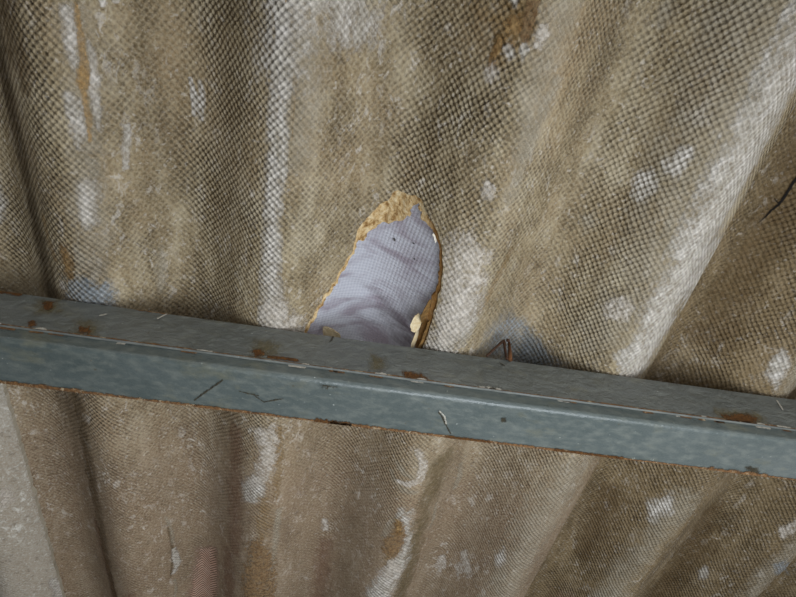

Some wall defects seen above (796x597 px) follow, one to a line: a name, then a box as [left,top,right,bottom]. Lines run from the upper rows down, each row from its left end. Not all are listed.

rust [488,0,541,72]
crack [761,178,796,221]
hole [304,190,443,349]
rust [0,320,795,432]
rust [0,380,796,481]